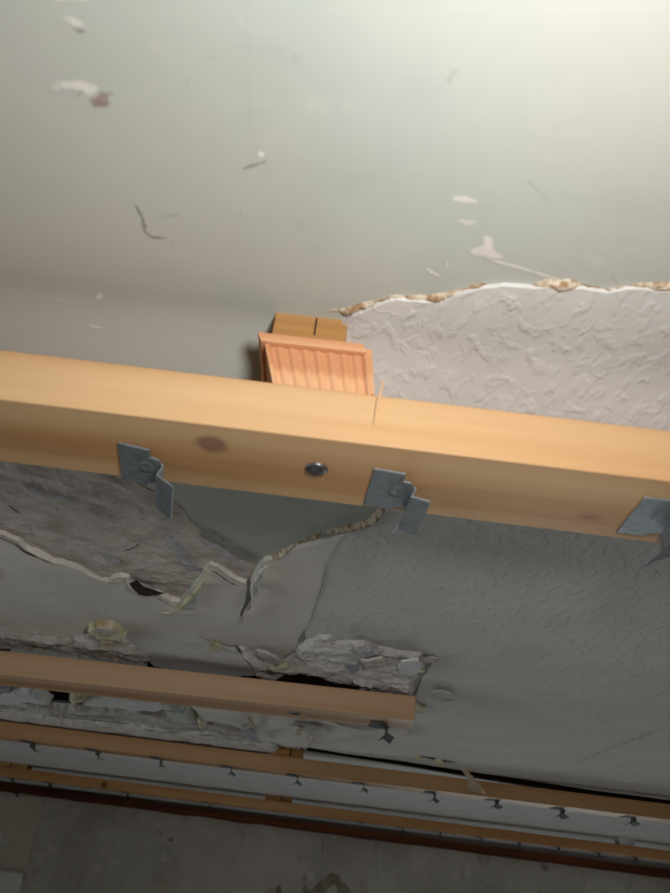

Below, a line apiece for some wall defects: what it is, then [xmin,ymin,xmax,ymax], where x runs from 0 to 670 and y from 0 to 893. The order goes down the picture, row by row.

spalling [45,75,118,110]
crack [128,199,182,248]
peeling [0,461,425,704]
peeling [0,685,408,754]